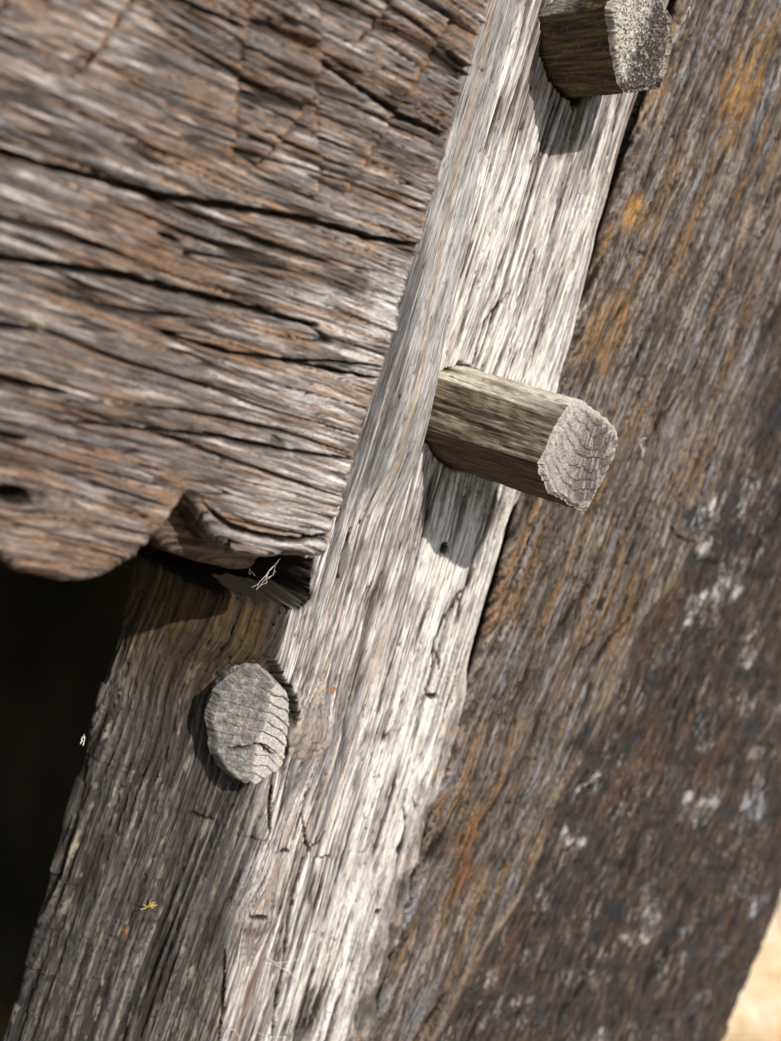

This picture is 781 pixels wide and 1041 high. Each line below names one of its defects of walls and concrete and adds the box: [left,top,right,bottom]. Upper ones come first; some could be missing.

crack [173,0,243,29]
crack [319,61,445,137]
crack [0,148,411,247]
crack [0,322,38,332]
crack [0,255,315,327]
crack [472,250,535,365]
crack [160,330,379,378]
crack [0,376,62,393]
crack [0,430,24,441]
crack [65,420,348,459]
crack [205,504,350,542]
crack [218,949,226,1041]